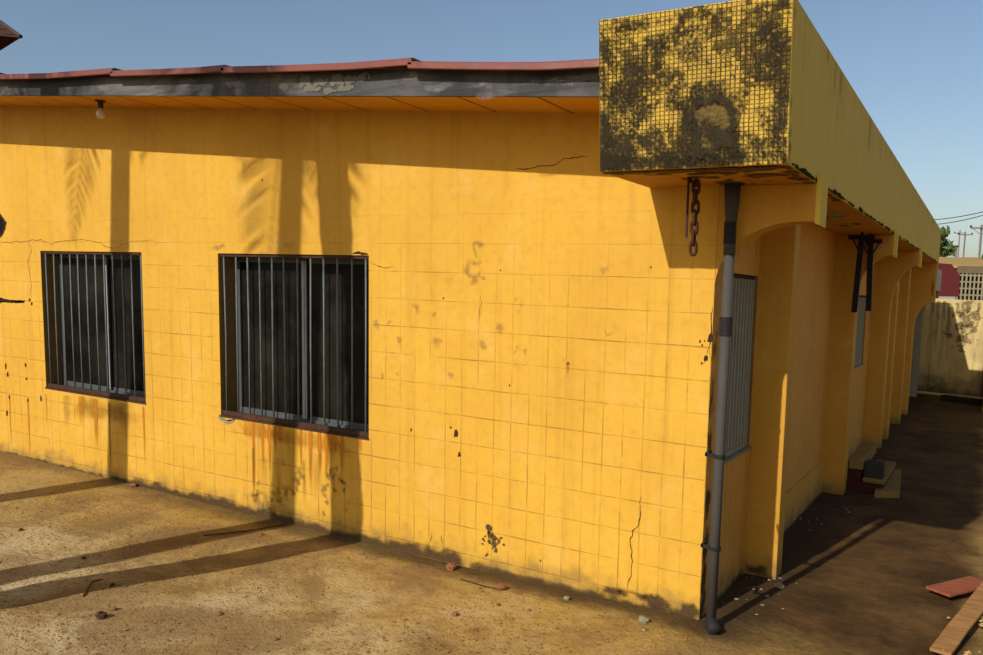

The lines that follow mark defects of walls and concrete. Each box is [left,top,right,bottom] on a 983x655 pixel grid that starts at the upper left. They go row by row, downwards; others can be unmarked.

water stain [424,84,450,92]
water stain [531,0,815,184]
crack [515,156,587,170]
peeling [602,167,802,186]
crack [0,239,147,292]
rust [245,423,282,485]
rust [300,431,343,475]
water stain [8,452,765,619]
crack [627,496,642,586]